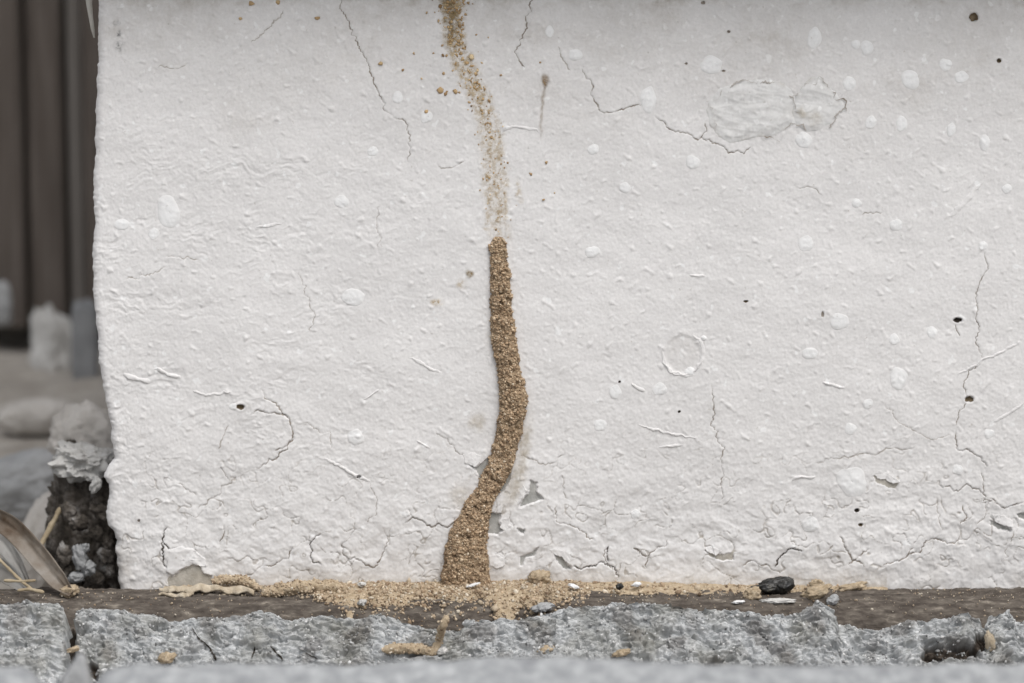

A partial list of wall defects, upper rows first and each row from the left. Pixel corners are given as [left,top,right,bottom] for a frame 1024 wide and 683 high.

crack [339,0,411,159]
crack [559,48,749,154]
crack [178,390,332,507]
crack [220,531,317,567]
crack [341,513,455,568]
spalling [488,513,524,534]
spalling [500,474,542,506]
crack [521,455,617,575]
crack [710,397,725,497]
crack [742,253,1020,567]